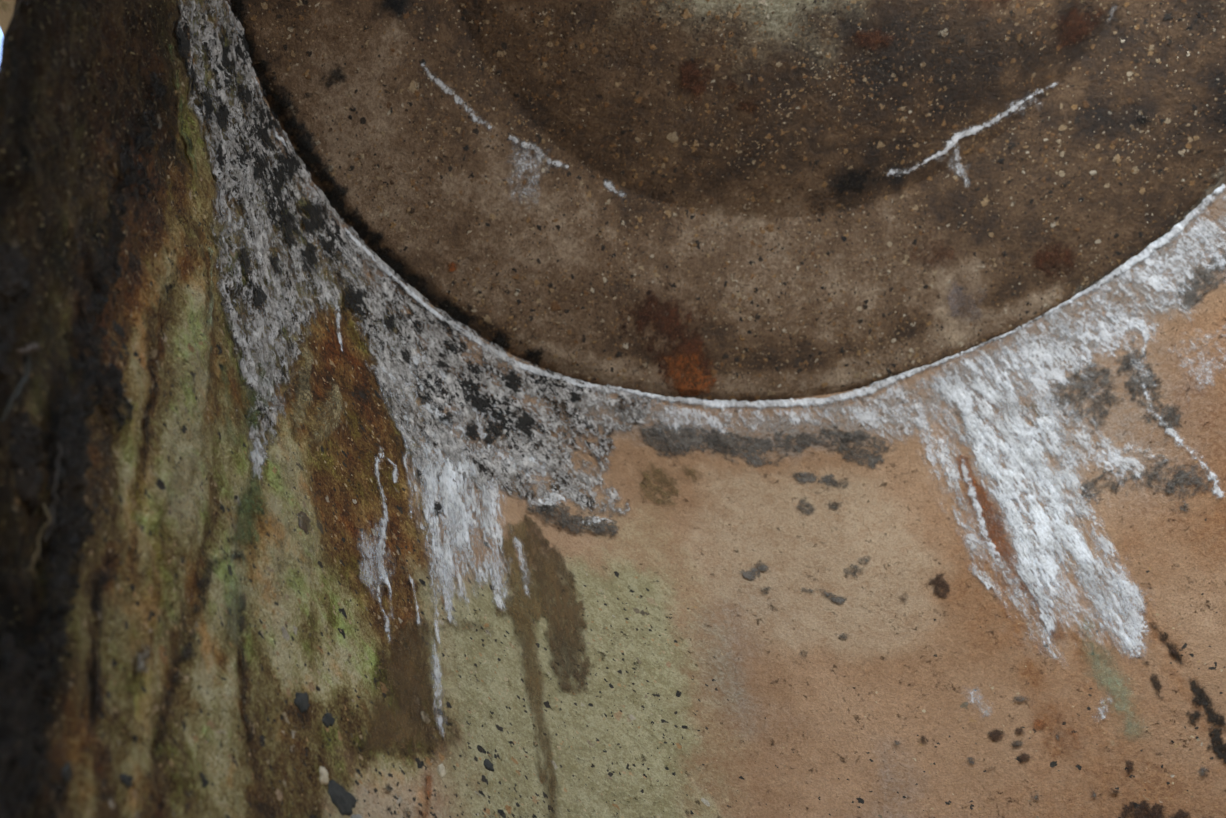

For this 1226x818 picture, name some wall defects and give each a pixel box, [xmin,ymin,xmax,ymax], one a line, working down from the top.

crack [421,64,568,176]
crack [888,83,1057,181]
corrosion [620,288,716,398]
water stain [176,0,1226,693]
water stain [361,453,459,756]
water stain [513,615,557,818]